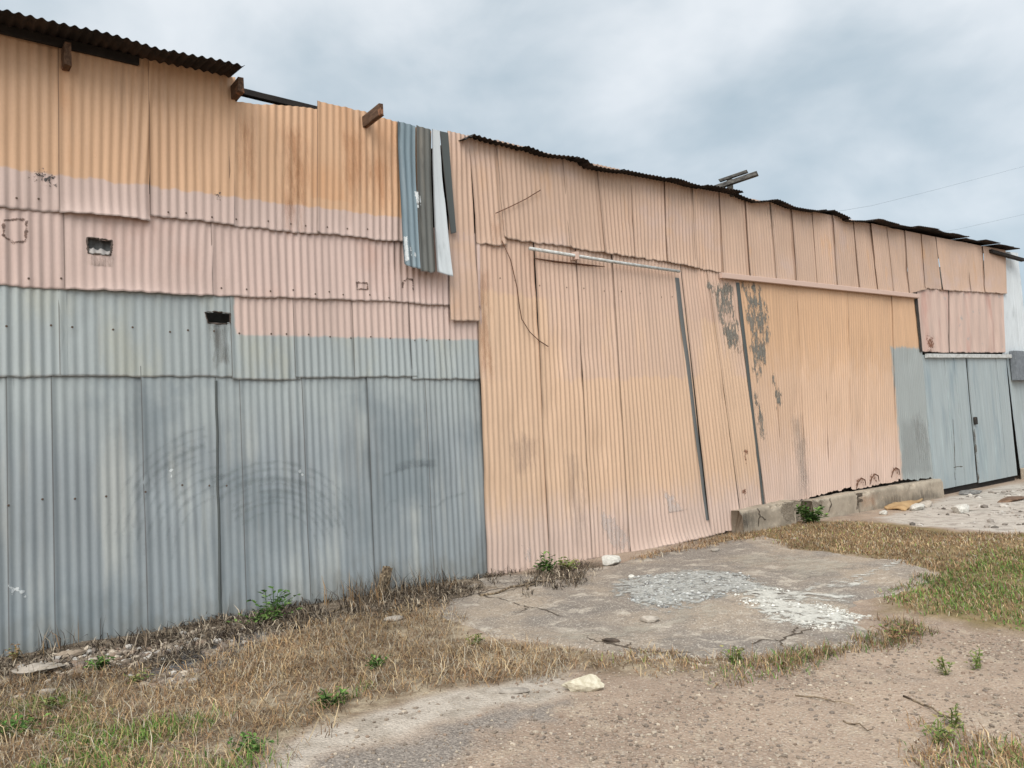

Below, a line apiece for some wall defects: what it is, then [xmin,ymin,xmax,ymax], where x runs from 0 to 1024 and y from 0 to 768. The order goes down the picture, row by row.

peeling [707,280,782,440]
crack [753,627,812,646]